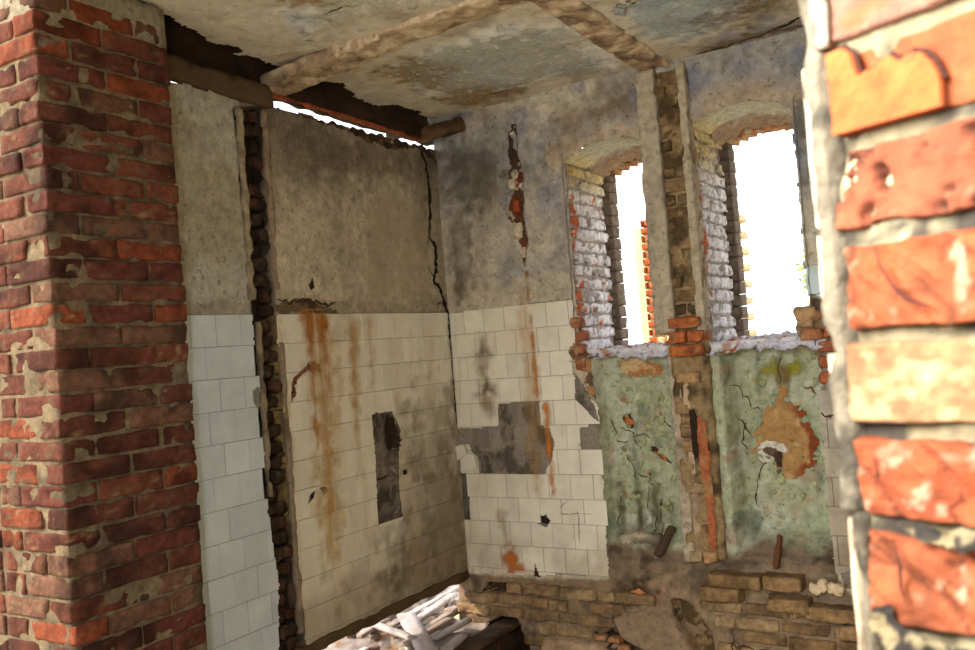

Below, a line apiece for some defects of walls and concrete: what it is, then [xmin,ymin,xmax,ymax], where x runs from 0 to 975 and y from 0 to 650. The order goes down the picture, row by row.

water stain [374,58,522,105]
spalling [508,124,528,265]
rust [299,309,332,408]
peeling [371,412,402,523]
crack [420,152,457,422]
peeling [458,401,555,474]
rust [531,333,551,458]
peeling [750,378,826,502]
spalling [793,298,836,387]
peeling [841,572,853,588]